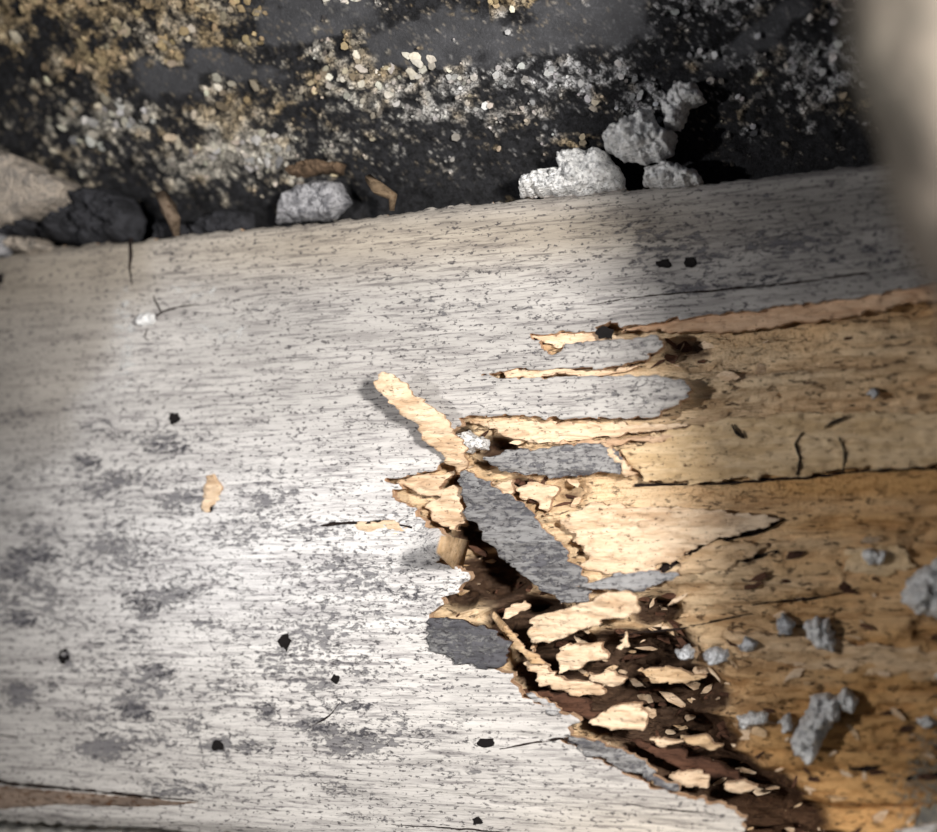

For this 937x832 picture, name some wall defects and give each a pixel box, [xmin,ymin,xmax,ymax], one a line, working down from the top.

peeling [894,823,937,832]